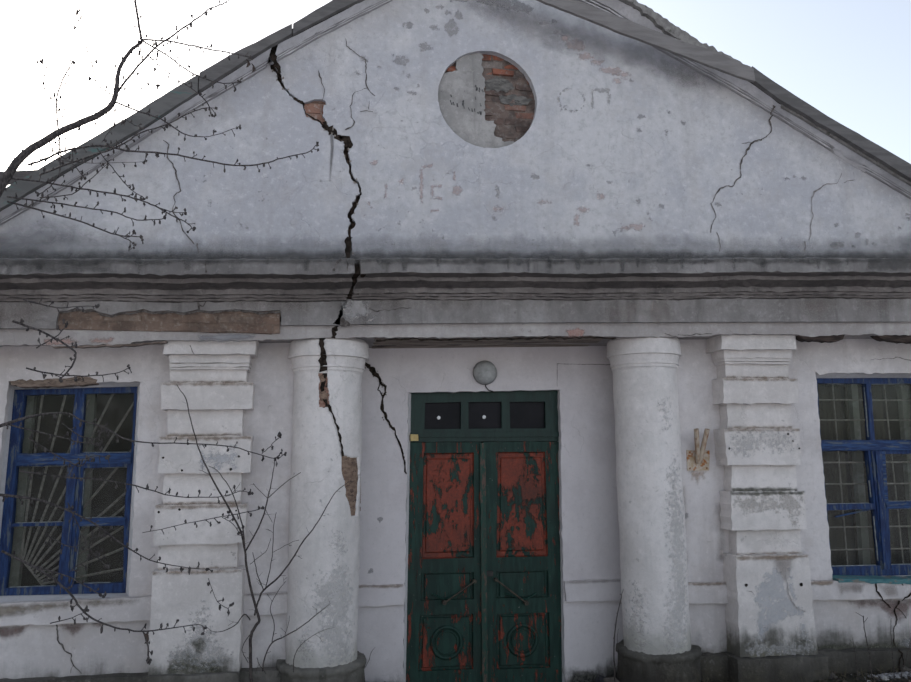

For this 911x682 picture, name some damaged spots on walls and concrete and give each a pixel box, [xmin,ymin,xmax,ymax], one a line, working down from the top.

flaking render [481,54,535,142]
crack [163,140,207,273]
crack [268,41,409,456]
crack [710,105,776,251]
crack [804,173,853,252]
flaking render [51,309,281,349]
flaking render [796,335,844,343]
flaking render [870,335,911,344]
flaking render [10,377,99,389]
crack [365,362,407,474]
flaking render [342,456,361,516]
crack [875,583,911,669]